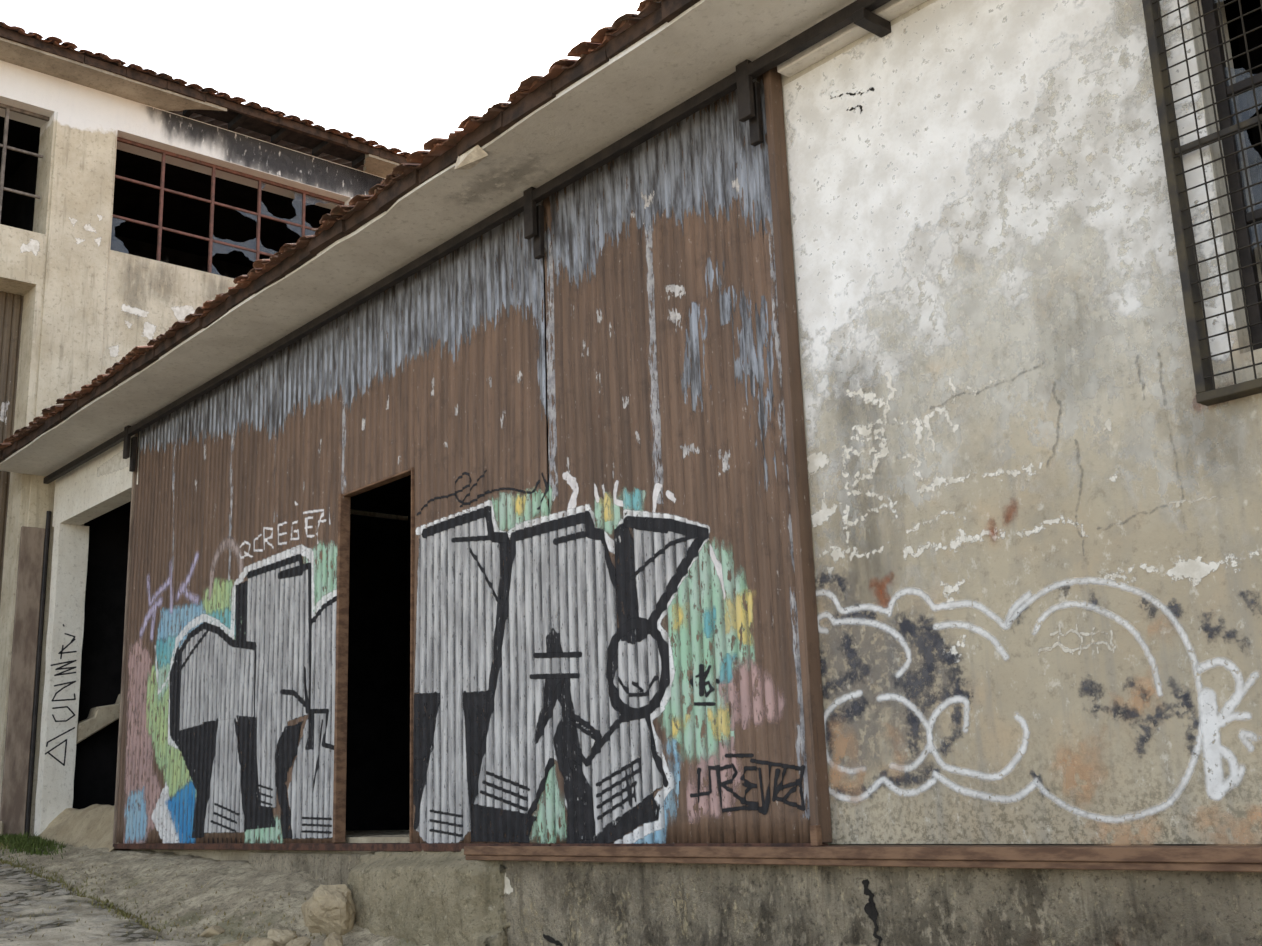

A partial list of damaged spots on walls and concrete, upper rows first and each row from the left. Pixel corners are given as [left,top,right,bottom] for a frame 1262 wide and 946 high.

peeling [1159,0,1235,361]
peeling [783,0,1221,527]
peeling [97,78,790,581]
crack [819,371,1088,663]
spalling [827,533,845,579]
spalling [1166,555,1223,587]
peeling [1203,614,1238,641]
peeling [790,589,810,820]
peeling [1081,680,1171,754]
crack [543,934,563,946]
crack [862,879,882,946]